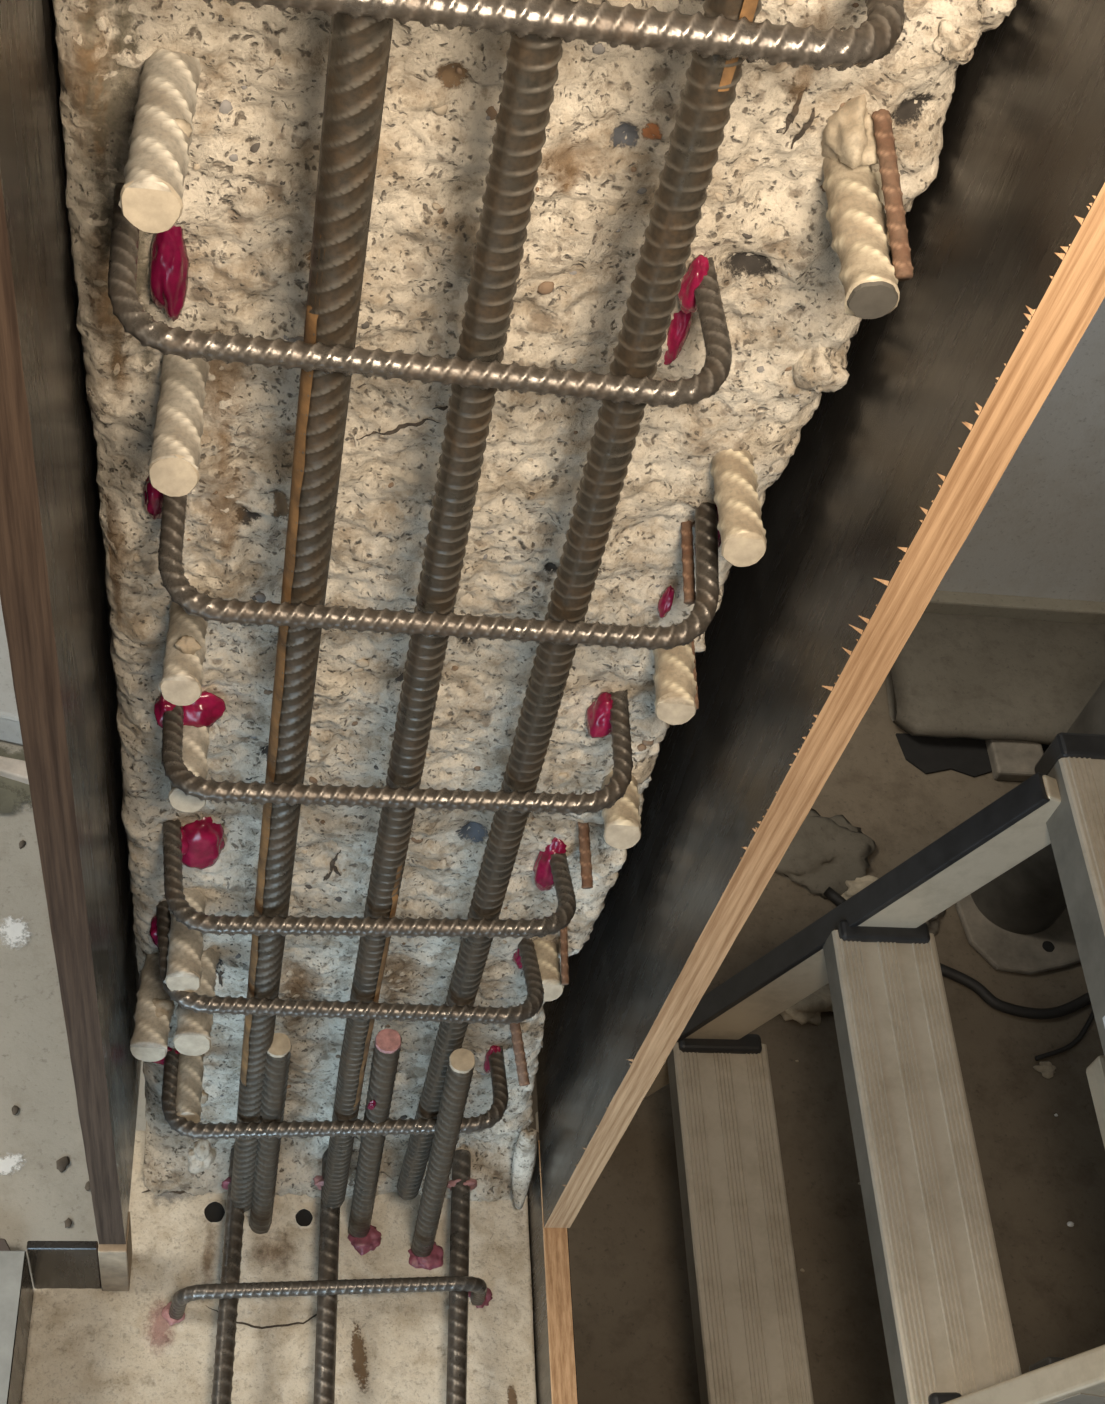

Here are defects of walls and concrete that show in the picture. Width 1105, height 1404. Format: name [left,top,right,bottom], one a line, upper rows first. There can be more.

spalling [283,13,394,348]
spalling [456,32,563,363]
rust [545,148,578,191]
rust [642,123,662,140]
spalling [609,52,745,379]
rust [210,475,238,549]
spalling [236,369,362,606]
crack [357,406,448,440]
spalling [414,384,498,614]
spalling [532,399,647,622]
spalling [211,934,286,1404]
spalling [287,935,412,1404]